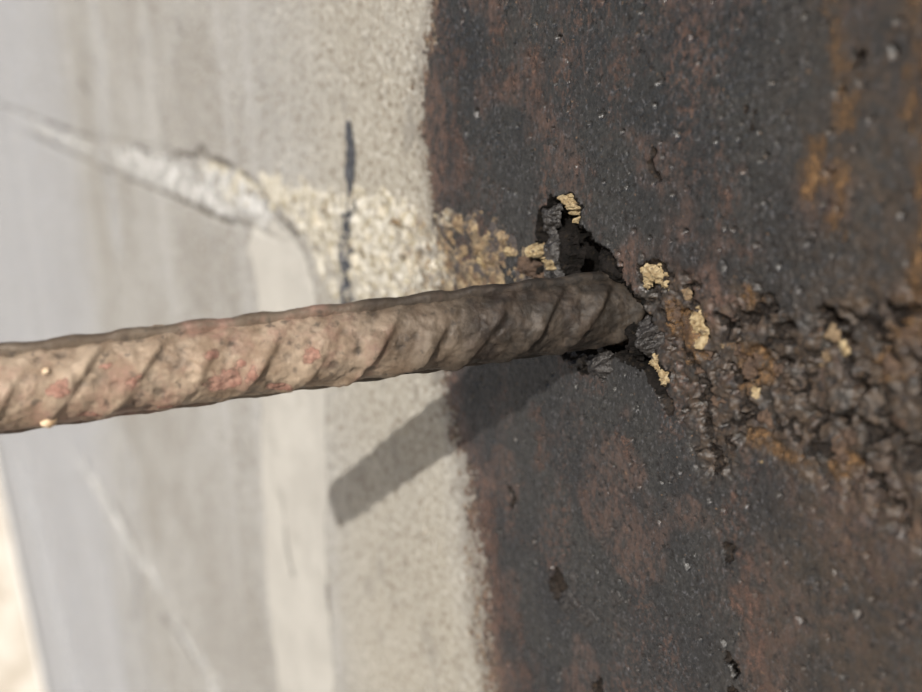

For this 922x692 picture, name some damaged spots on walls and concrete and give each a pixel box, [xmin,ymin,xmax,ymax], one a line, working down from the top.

rust [202,358,258,391]
spalling [201,159,922,528]
rust [665,298,709,365]